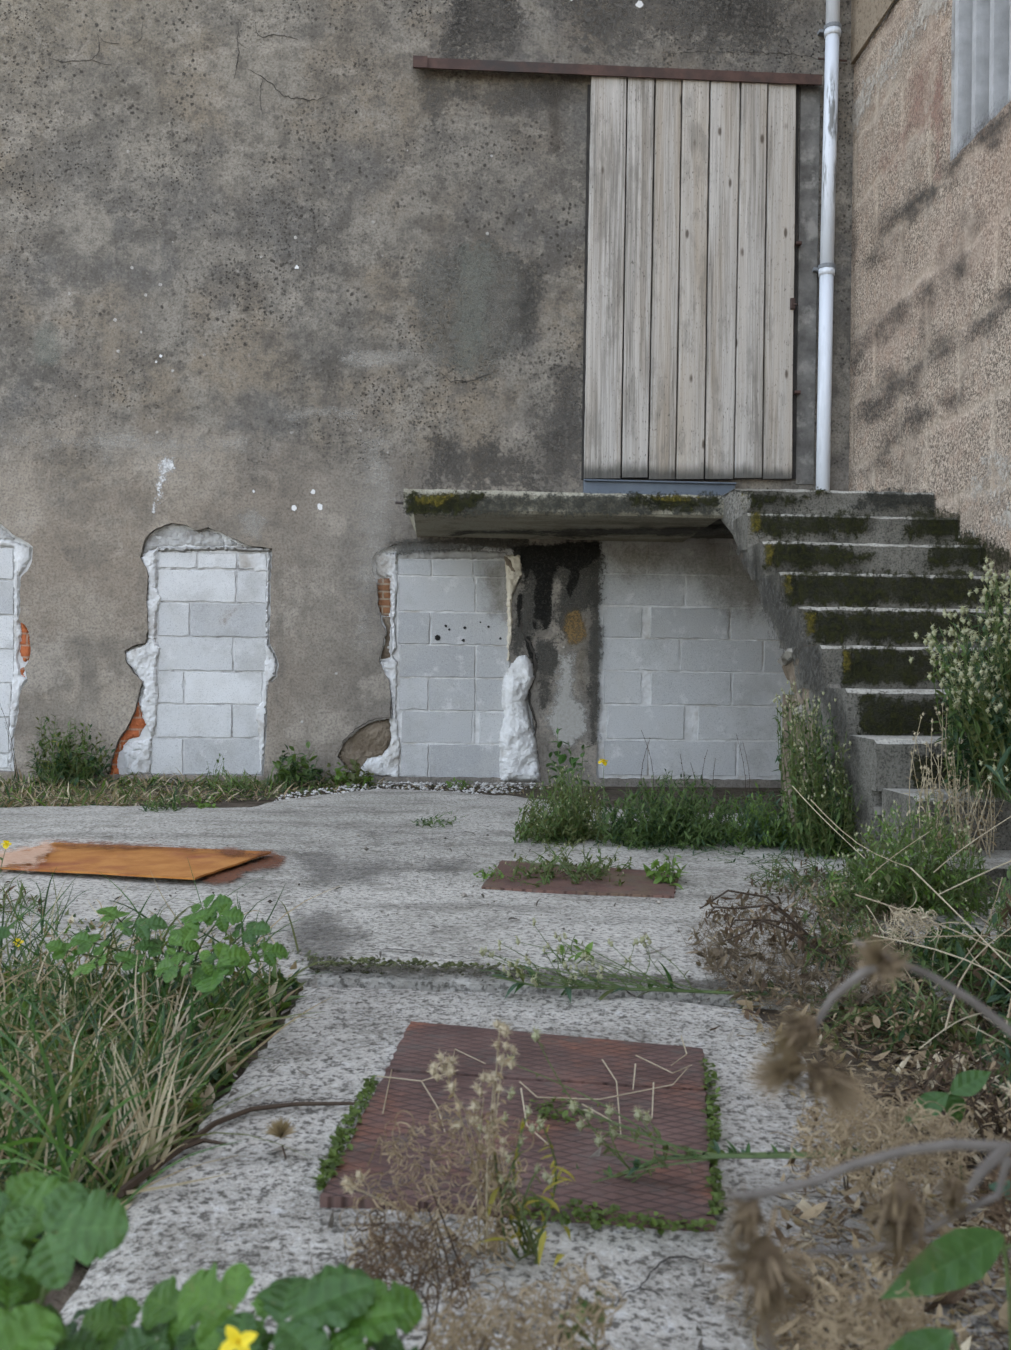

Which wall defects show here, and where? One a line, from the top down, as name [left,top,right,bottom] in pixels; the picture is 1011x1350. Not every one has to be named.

damp [438,0,526,60]
damp [556,0,811,60]
crack [234,20,327,114]
flaking render [20,623,31,677]
flaking render [377,578,391,659]
damp [391,527,858,770]
flaking render [110,702,146,775]
peeling [338,719,391,775]